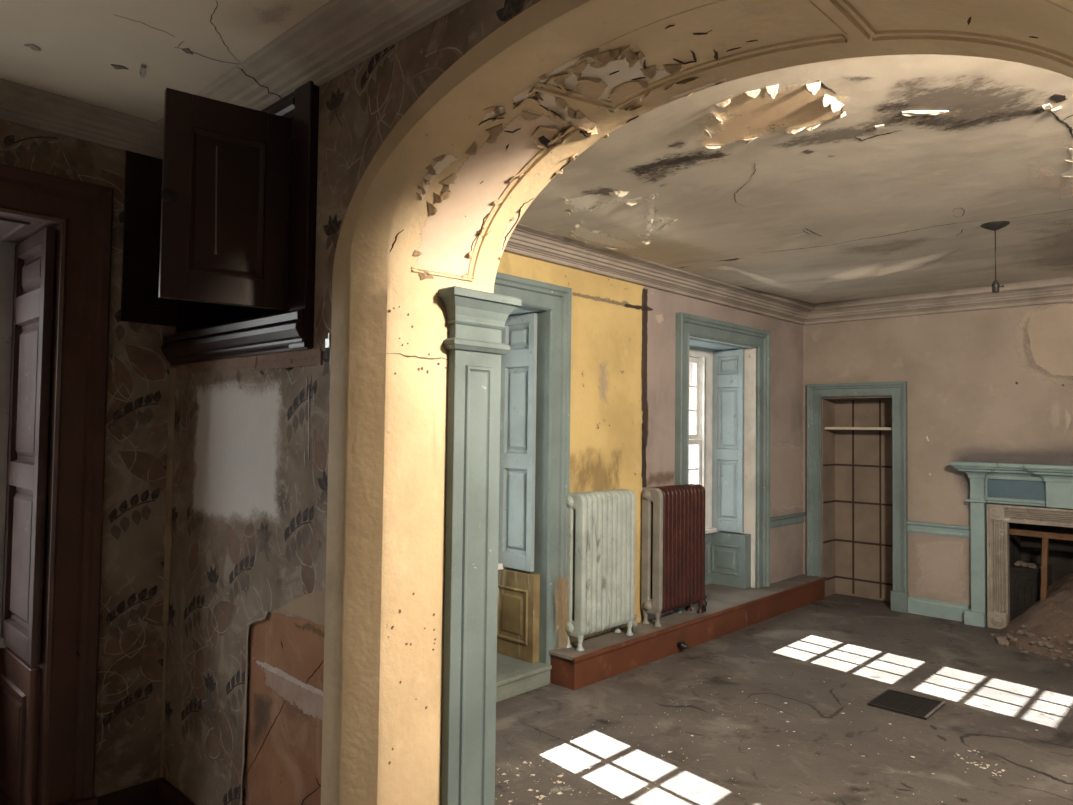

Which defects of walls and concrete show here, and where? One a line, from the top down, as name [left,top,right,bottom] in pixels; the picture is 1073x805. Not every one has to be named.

crack [116,1,282,99]
spalling [700,82,846,149]
leakage [773,77,1049,154]
crack [1048,109,1073,138]
peeling [412,45,727,280]
crack [387,352,448,360]
flaking render [245,590,325,805]